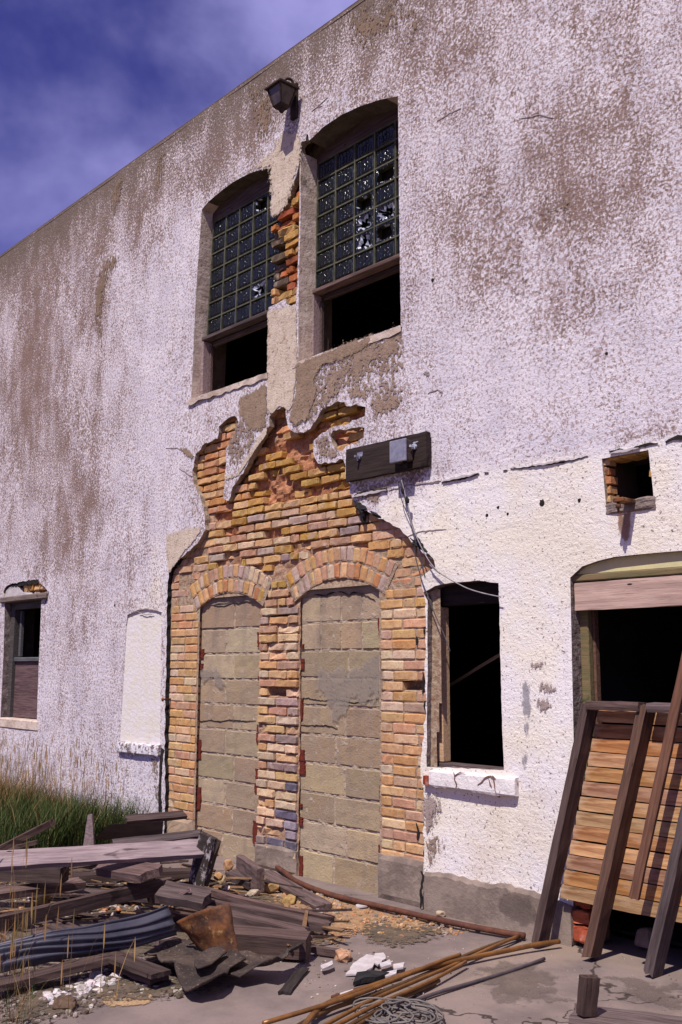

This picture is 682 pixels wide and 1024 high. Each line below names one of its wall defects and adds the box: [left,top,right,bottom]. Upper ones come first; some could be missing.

flaking render [271,183,300,305]
damp [94,253,118,357]
crack [352,435,682,498]
peeling [5,583,47,597]
flaking render [150,322,480,947]